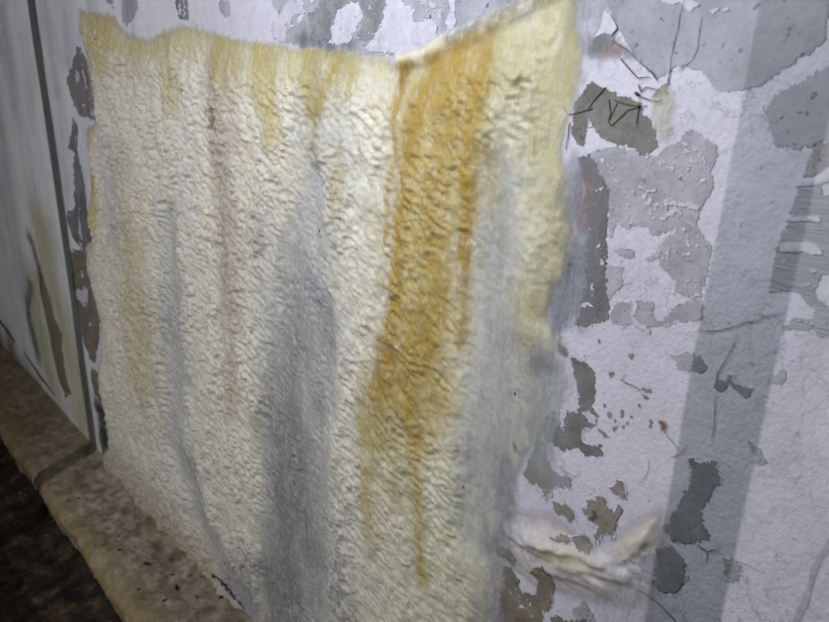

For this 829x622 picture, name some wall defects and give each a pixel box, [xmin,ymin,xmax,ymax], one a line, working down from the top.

peeling [270,0,514,58]
peeling [595,0,829,92]
leakage [26,207,85,431]
flaking render [66,46,102,401]
leakage [78,0,627,622]
corrosion [358,32,492,581]
peeling [571,81,719,334]
peeling [768,186,829,338]
peeling [490,546,596,622]
peeling [522,354,633,555]
peeling [622,456,724,593]
crack [792,538,829,622]